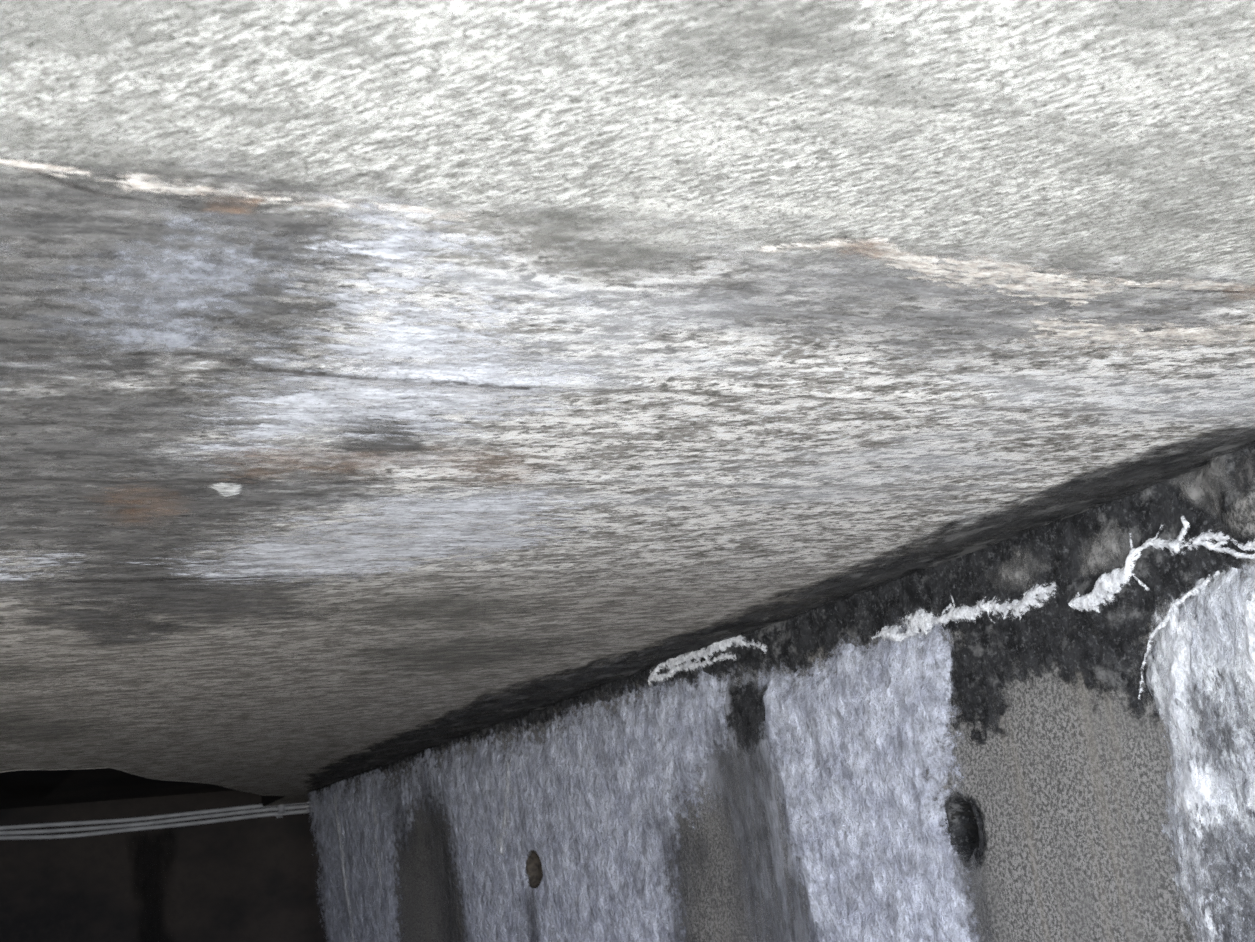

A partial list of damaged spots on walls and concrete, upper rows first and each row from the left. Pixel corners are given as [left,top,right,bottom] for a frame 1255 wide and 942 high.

water stain [0,161,596,647]
water stain [304,425,1255,942]